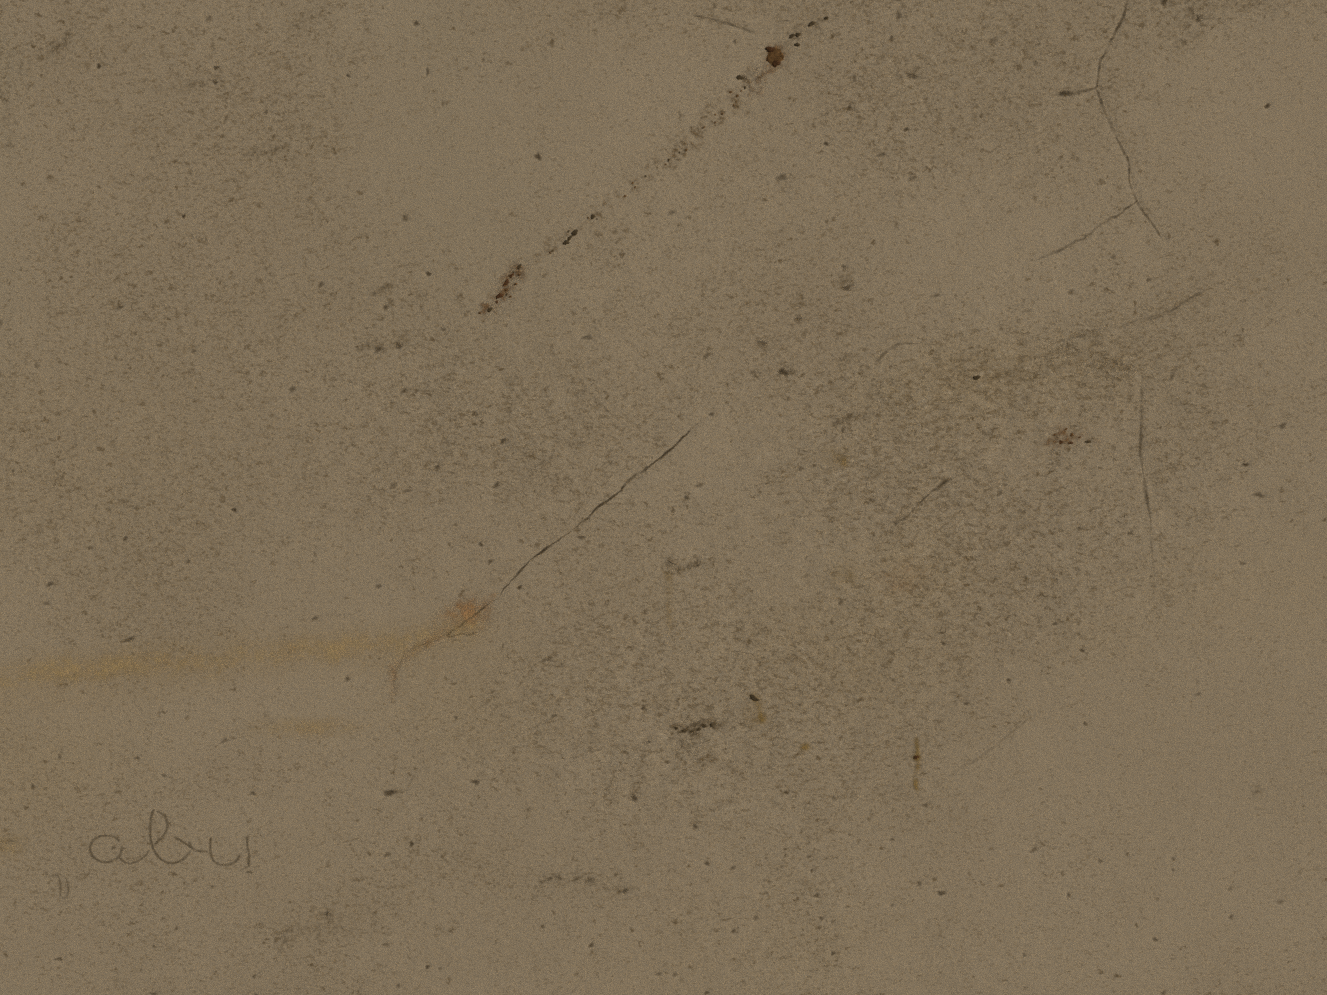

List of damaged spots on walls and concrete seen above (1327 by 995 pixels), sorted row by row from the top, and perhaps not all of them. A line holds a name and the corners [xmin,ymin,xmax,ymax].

corrosion [765,46,784,67]
corrosion [478,264,522,314]
crack [447,432,689,636]